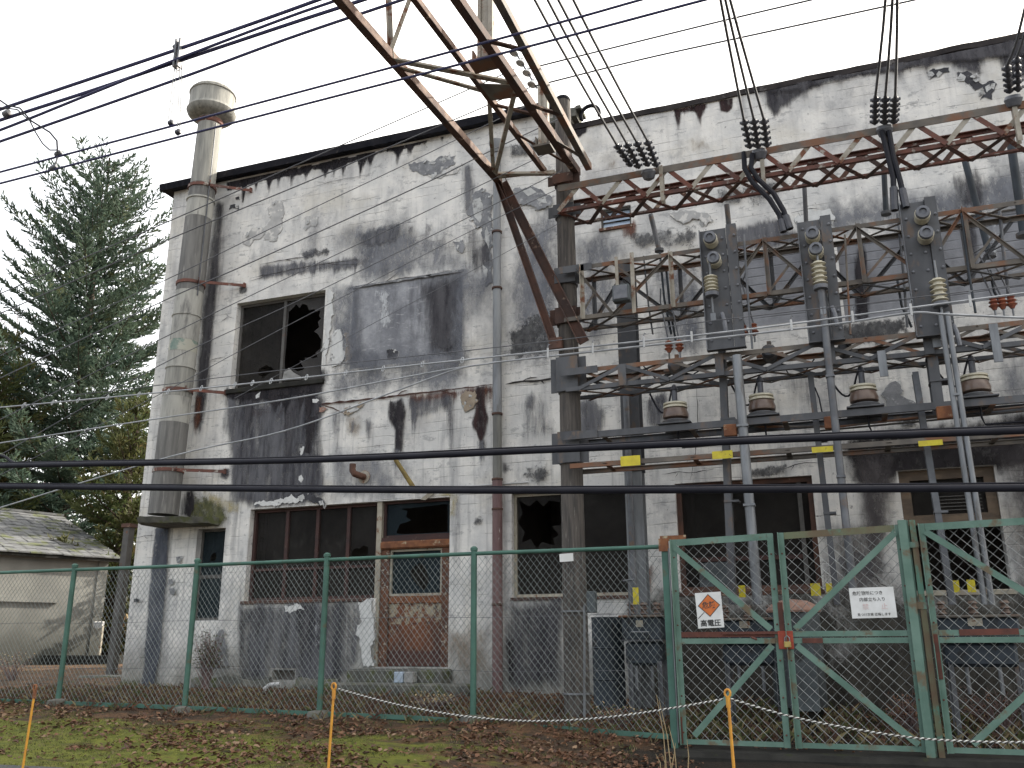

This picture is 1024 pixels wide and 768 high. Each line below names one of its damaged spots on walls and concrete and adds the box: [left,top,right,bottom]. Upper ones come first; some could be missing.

peeling [926,67,997,100]
leakage [674,104,706,125]
leakage [719,98,733,112]
leakage [511,138,538,156]
leakage [194,202,223,431]
peeling [320,289,353,368]
leakage [334,233,490,460]
corrosion [410,386,492,402]
leakage [221,370,337,507]
peeling [254,475,326,509]
peeling [356,598,377,667]